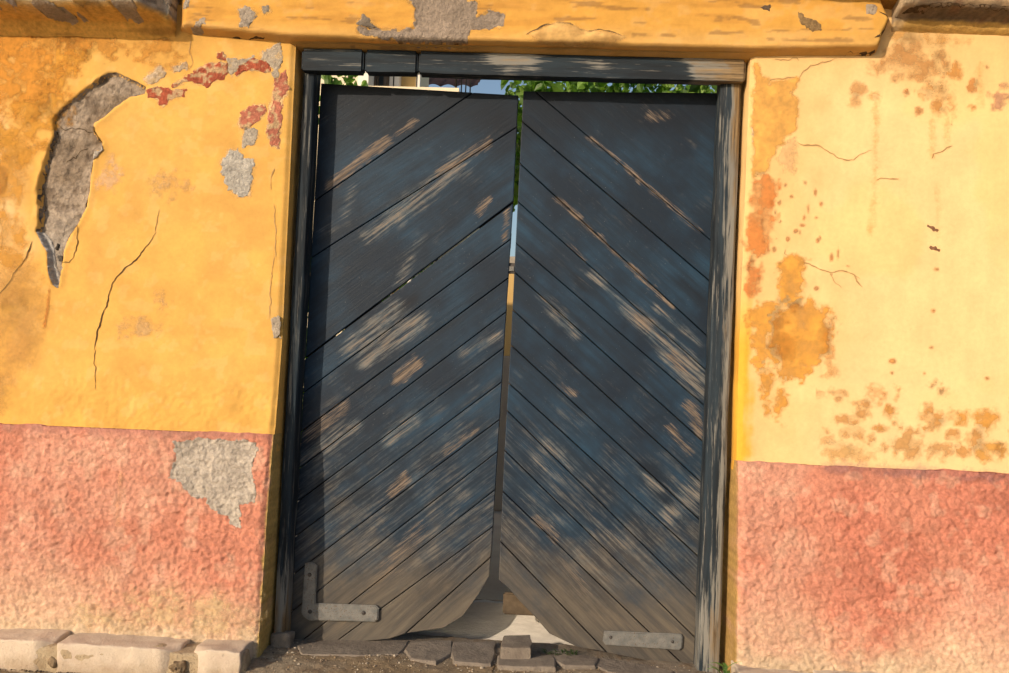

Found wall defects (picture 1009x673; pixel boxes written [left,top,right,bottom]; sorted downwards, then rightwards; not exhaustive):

peeling [356,0,505,50]
spalling [36,42,290,288]
crack [799,143,871,161]
crack [0,242,32,293]
crack [784,252,862,287]
crack [93,213,159,390]